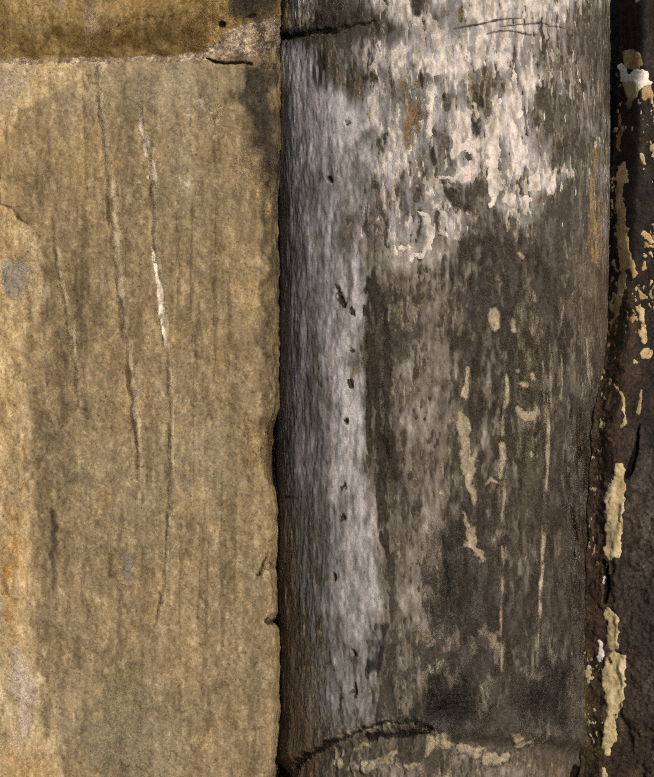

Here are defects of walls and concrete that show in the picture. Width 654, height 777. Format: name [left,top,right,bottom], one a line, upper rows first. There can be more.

crack [282,20,374,41]
damp [413,0,421,16]
damp [312,47,327,87]
damp [404,99,419,146]
damp [444,187,470,212]
damp [587,148,602,264]
peeling [256,0,654,777]
damp [351,271,399,559]
damp [414,230,592,728]
damp [367,623,389,673]
damp [9,652,34,738]
crack [295,719,434,769]